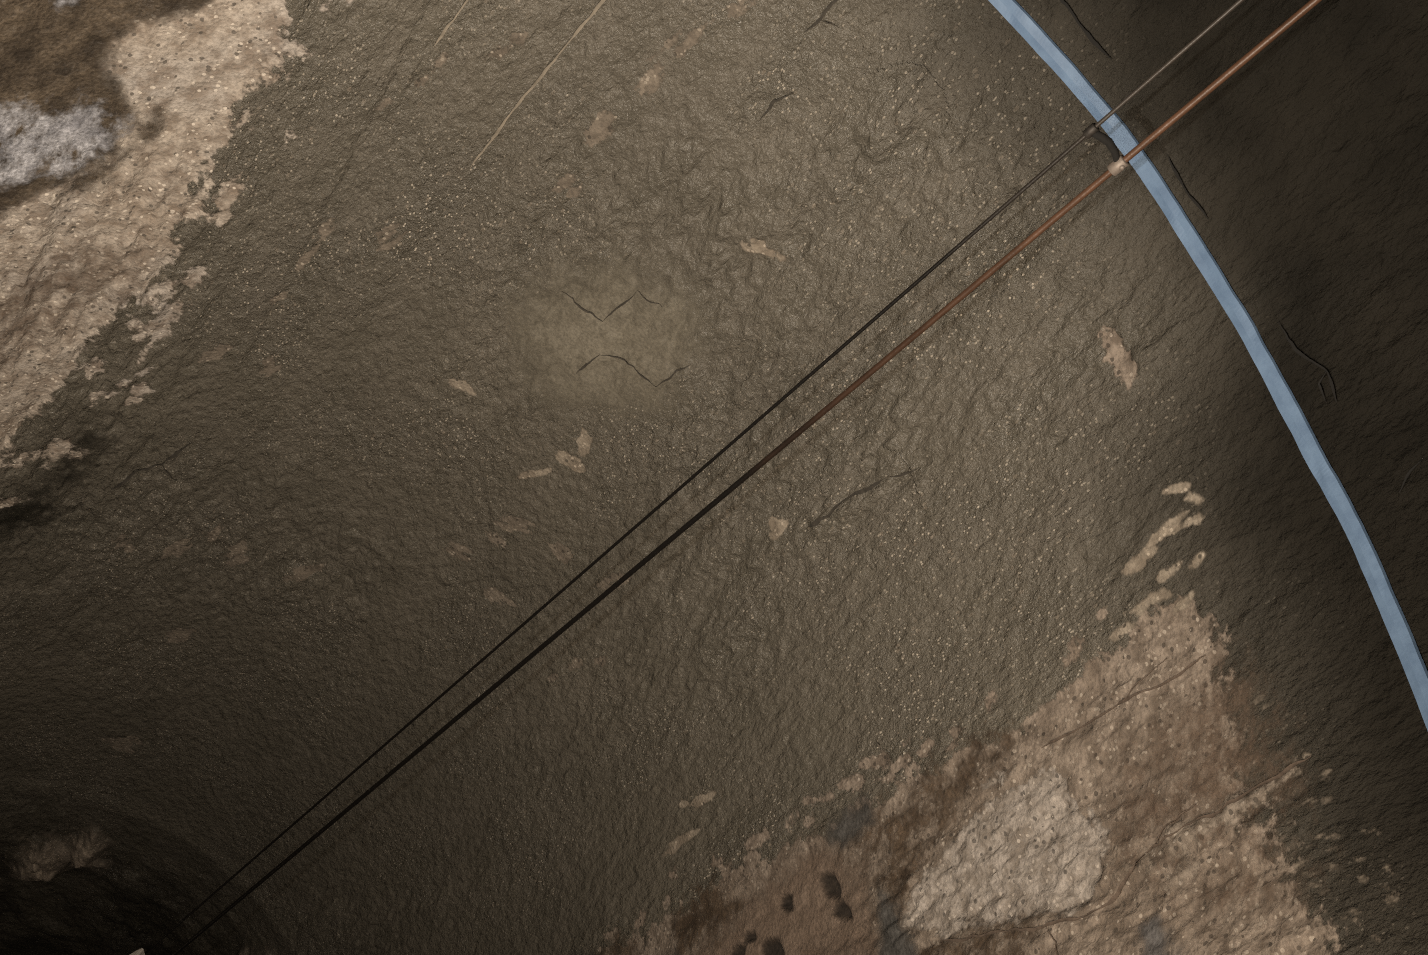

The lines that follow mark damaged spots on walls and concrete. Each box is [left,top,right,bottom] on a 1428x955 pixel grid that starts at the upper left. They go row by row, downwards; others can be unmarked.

leakage [0,0,210,211]
peeling [0,0,312,471]
peeling [295,218,334,272]
peeling [449,378,476,395]
peeling [0,497,32,509]
peeling [161,524,250,567]
peeling [485,515,537,548]
peeling [584,482,1357,955]